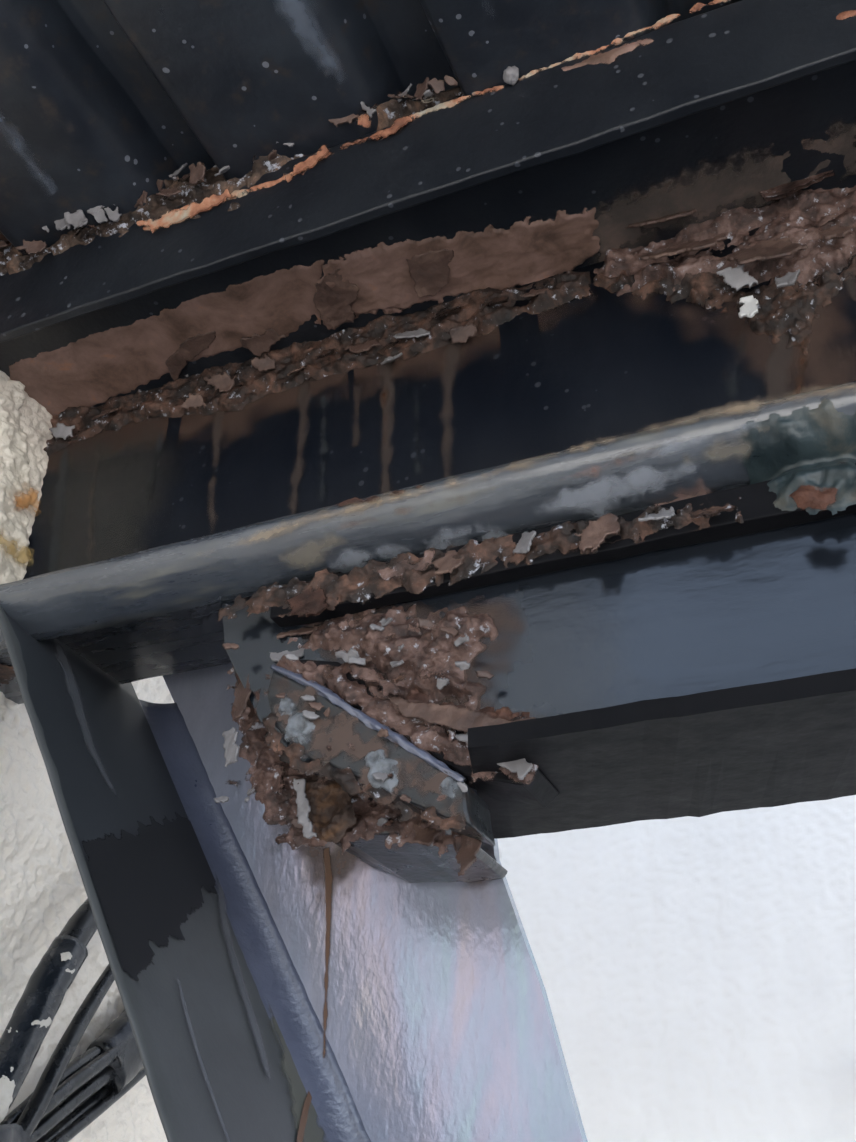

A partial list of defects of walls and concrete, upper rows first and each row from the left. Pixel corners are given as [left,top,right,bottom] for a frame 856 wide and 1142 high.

peeling [277,0,338,70]
peeling [360,101,377,118]
corrosion [593,170,856,515]
corrosion [214,497,744,1057]